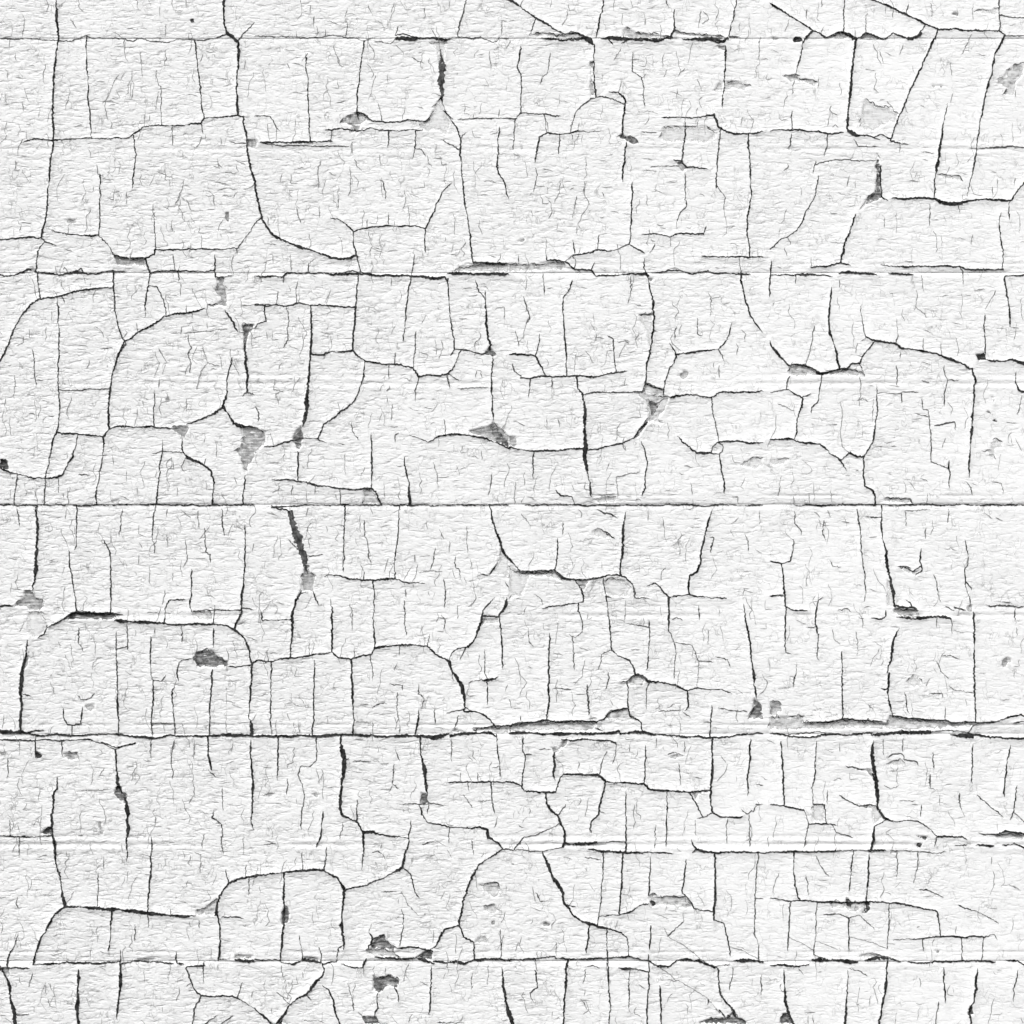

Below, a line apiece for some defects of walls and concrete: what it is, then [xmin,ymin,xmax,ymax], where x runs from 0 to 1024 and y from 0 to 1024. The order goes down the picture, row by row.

peeling [234,425,265,470]
crack [0,0,509,590]
peeling [469,422,516,447]
crack [441,0,676,265]
crack [410,54,763,497]
crack [682,0,739,108]
crack [769,214,1024,631]
crack [770,0,1024,328]
peeling [192,648,228,667]
crack [0,435,1024,1024]
peeling [369,933,400,959]
peeling [373,974,399,992]